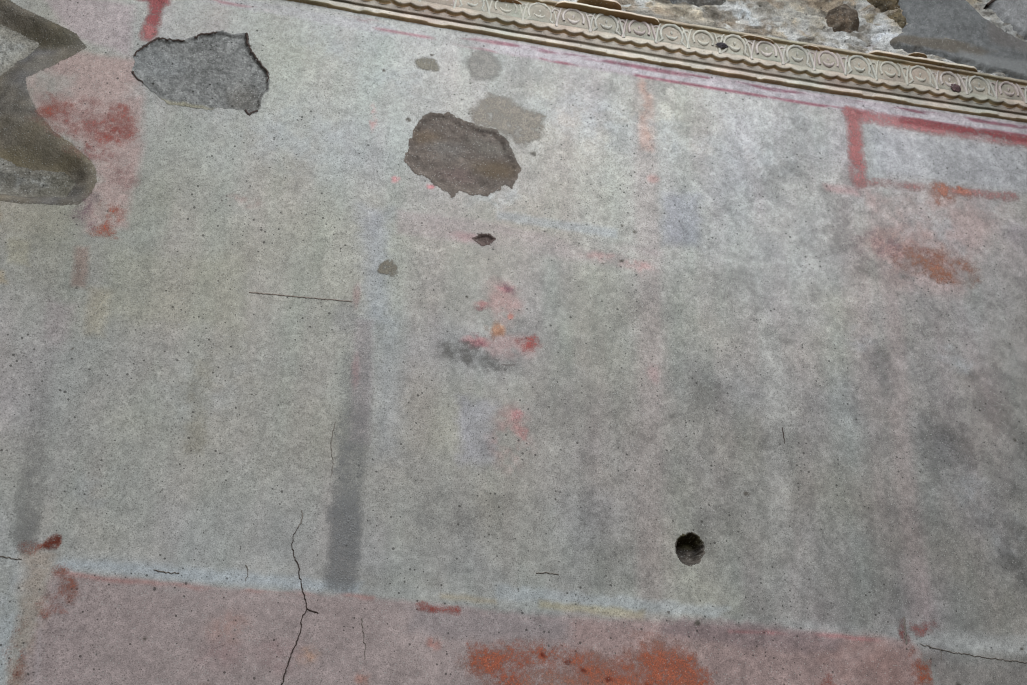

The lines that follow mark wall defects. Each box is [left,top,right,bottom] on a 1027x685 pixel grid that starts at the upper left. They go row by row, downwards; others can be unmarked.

flaking render [0,0,97,206]
flaking render [131,30,270,115]
flaking render [404,112,521,198]
crack [281,510,318,685]
crack [903,617,1027,663]